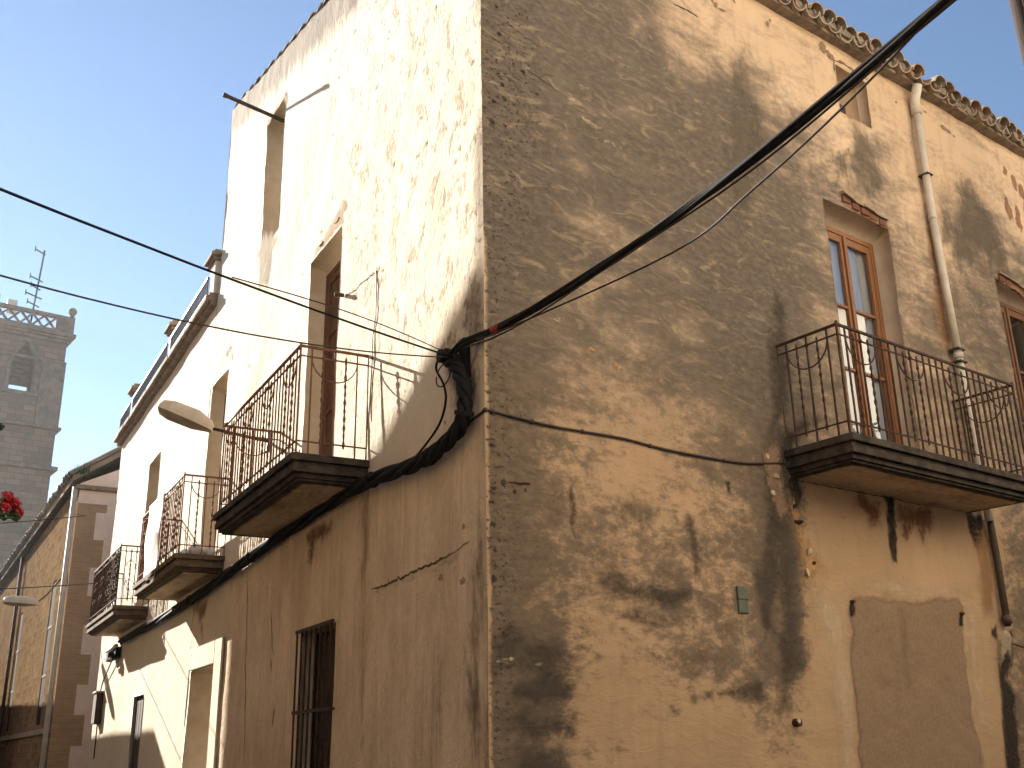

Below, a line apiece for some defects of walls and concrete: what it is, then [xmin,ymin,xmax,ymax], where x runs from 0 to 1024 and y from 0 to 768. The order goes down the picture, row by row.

spalling [840,190,889,228]
peeling [1003,166,1024,232]
peeling [763,443,822,577]
damp [883,495,897,562]
crack [371,540,470,590]
damp [654,589,690,606]
damp [757,499,798,674]
damp [495,630,575,698]
damp [992,626,1021,768]